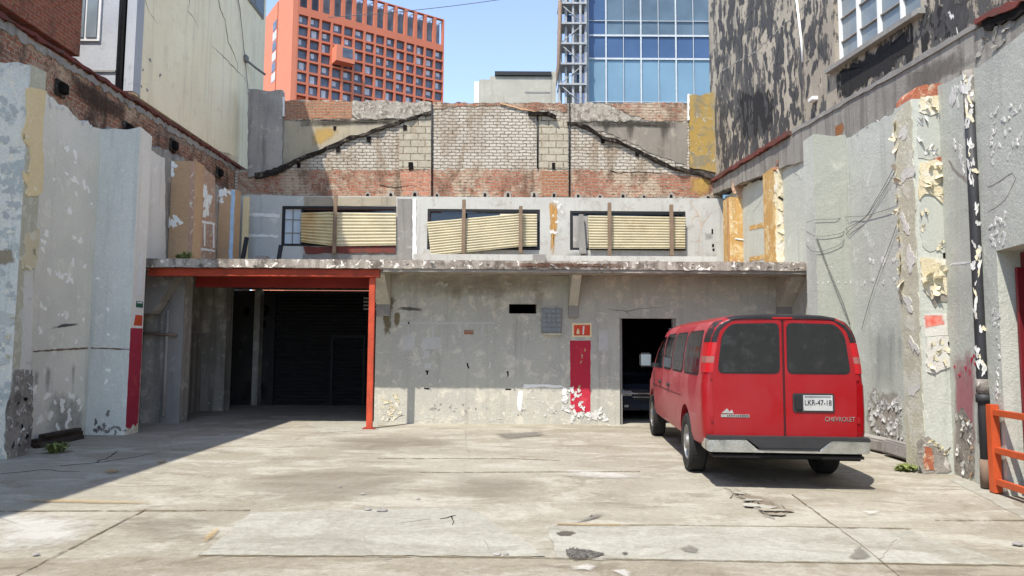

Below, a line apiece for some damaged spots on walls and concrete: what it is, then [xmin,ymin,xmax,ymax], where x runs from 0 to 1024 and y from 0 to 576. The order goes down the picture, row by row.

crack [212,0,246,81]
flaking render [0,87,93,220]
peeling [989,103,1022,166]
flaking render [169,215,183,228]
peeling [817,74,979,313]
spalling [0,229,86,459]
peeling [510,385,609,423]
spalling [867,383,921,441]
peeling [916,408,975,479]